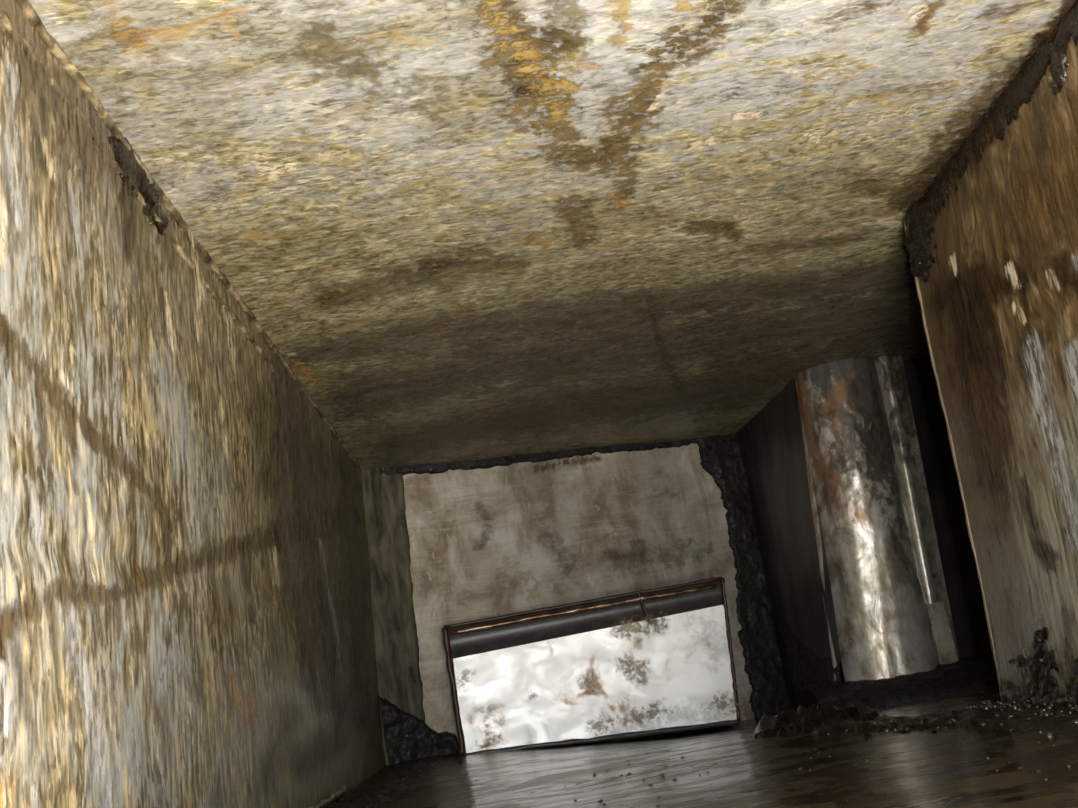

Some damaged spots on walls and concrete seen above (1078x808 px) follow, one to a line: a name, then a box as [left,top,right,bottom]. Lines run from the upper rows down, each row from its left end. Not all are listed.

rust [471,0,585,165]
rust [599,0,742,158]
leakage [316,249,530,310]
leakage [553,195,601,247]
peeling [1005,262,1021,288]
rust [992,93,1078,259]
leakage [1051,251,1078,326]
leakage [252,261,1053,781]
leakage [1025,332,1078,552]